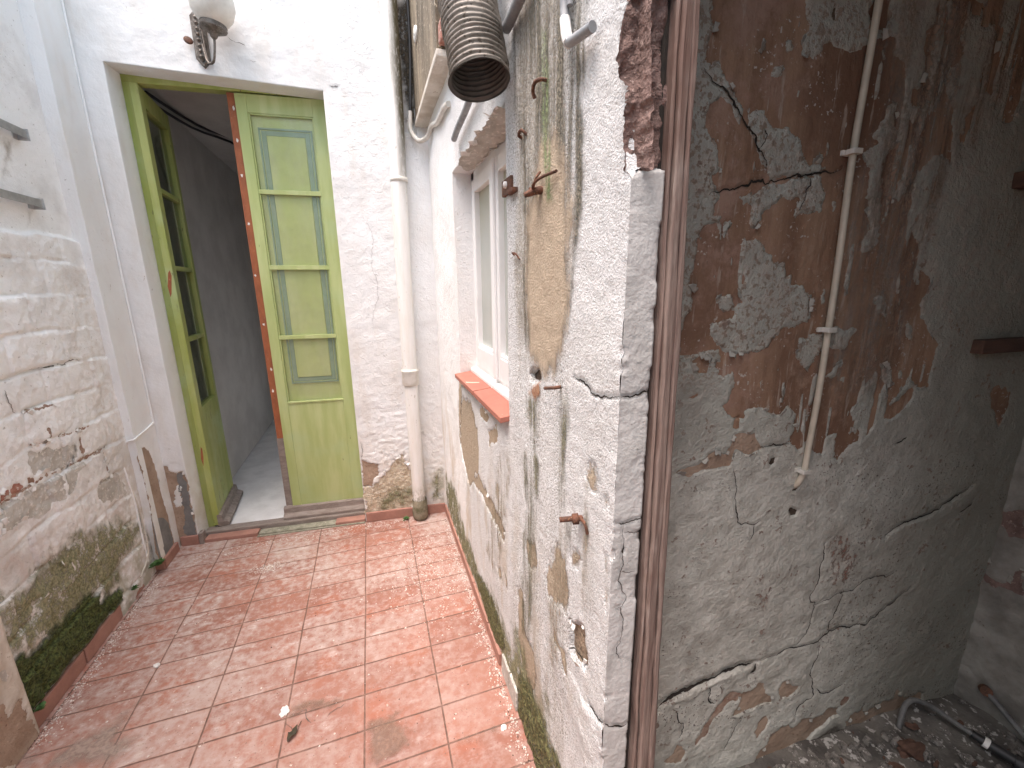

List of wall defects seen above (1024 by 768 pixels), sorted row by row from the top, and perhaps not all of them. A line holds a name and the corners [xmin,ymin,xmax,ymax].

water stain [513,0,584,242]
spalling [616,0,668,172]
crack [704,68,841,209]
peeling [676,0,1024,477]
peeling [0,425,127,536]
peeling [459,382,505,539]
water stain [489,483,507,566]
water stain [522,399,539,631]
crack [573,376,647,399]
crack [733,469,758,538]
spalling [555,620,588,673]
crack [657,537,908,736]